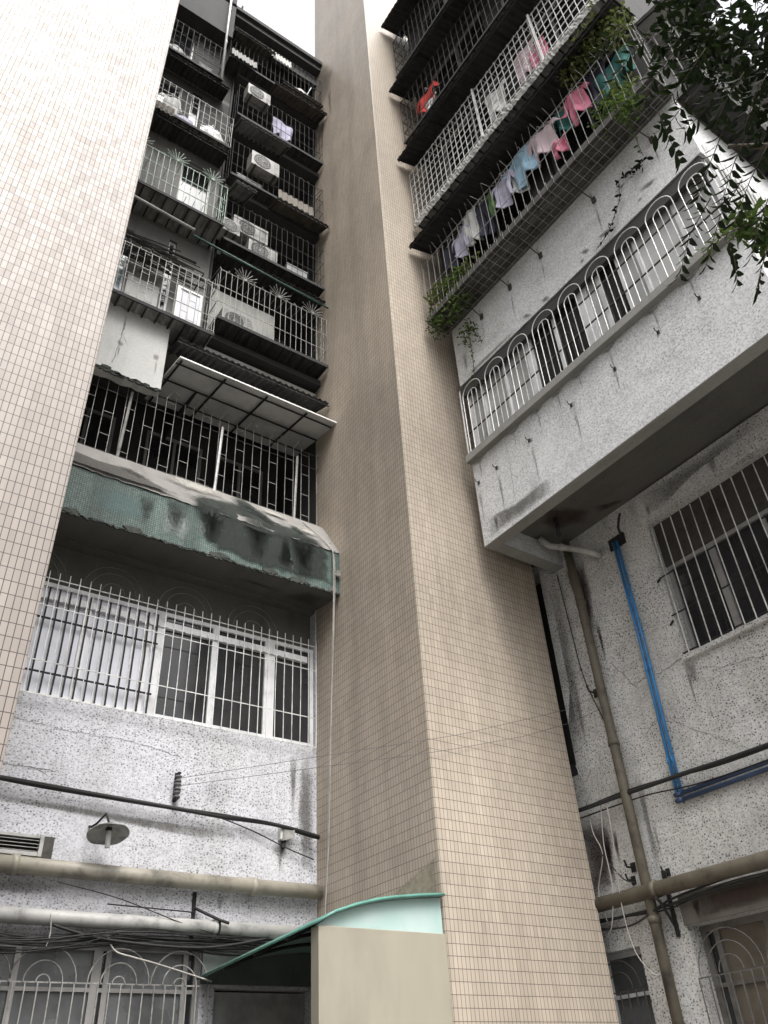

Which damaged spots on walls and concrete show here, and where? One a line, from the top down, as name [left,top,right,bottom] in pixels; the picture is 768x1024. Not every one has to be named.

damp [495,492,536,525]
damp [281,525,309,572]
damp [587,829,619,886]